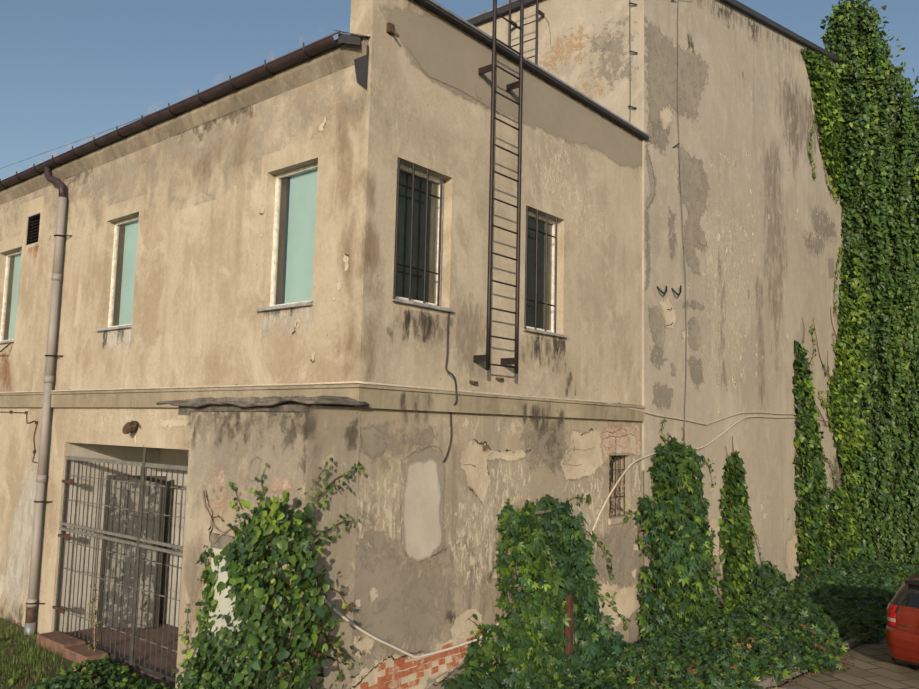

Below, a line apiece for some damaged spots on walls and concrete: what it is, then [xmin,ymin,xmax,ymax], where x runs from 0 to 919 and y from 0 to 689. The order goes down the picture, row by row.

flaking render [591,18,708,156]
flaking render [667,146,754,276]
leakage [405,312,442,341]
leakage [532,333,566,362]
flaking render [648,284,704,384]
flaking render [653,383,673,408]
flaking render [460,439,538,506]
flaking render [560,424,641,481]
flaking render [327,607,482,689]